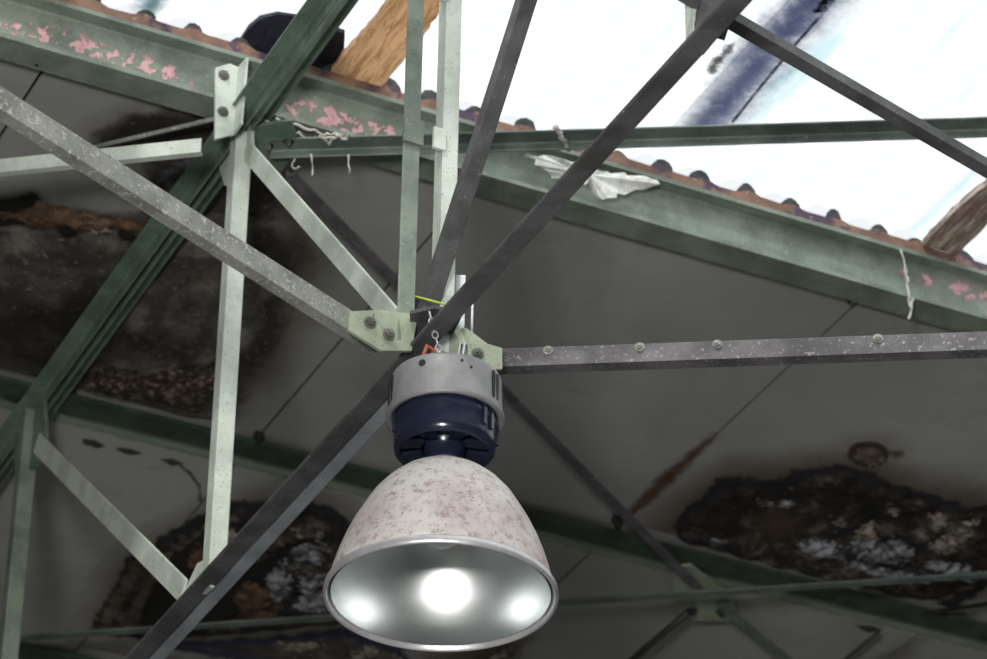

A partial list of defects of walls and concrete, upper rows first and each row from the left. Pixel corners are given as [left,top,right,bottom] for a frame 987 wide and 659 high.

peeling [0,20,197,87]
leakage [99,113,214,149]
peeling [285,99,396,135]
leakage [147,157,194,193]
leakage [248,169,277,220]
corrosion [630,439,712,513]
peeling [91,555,177,638]
peeling [154,513,206,587]
peeling [187,500,350,638]
peeling [662,463,987,607]
leakage [175,628,409,659]
leakage [446,648,490,659]